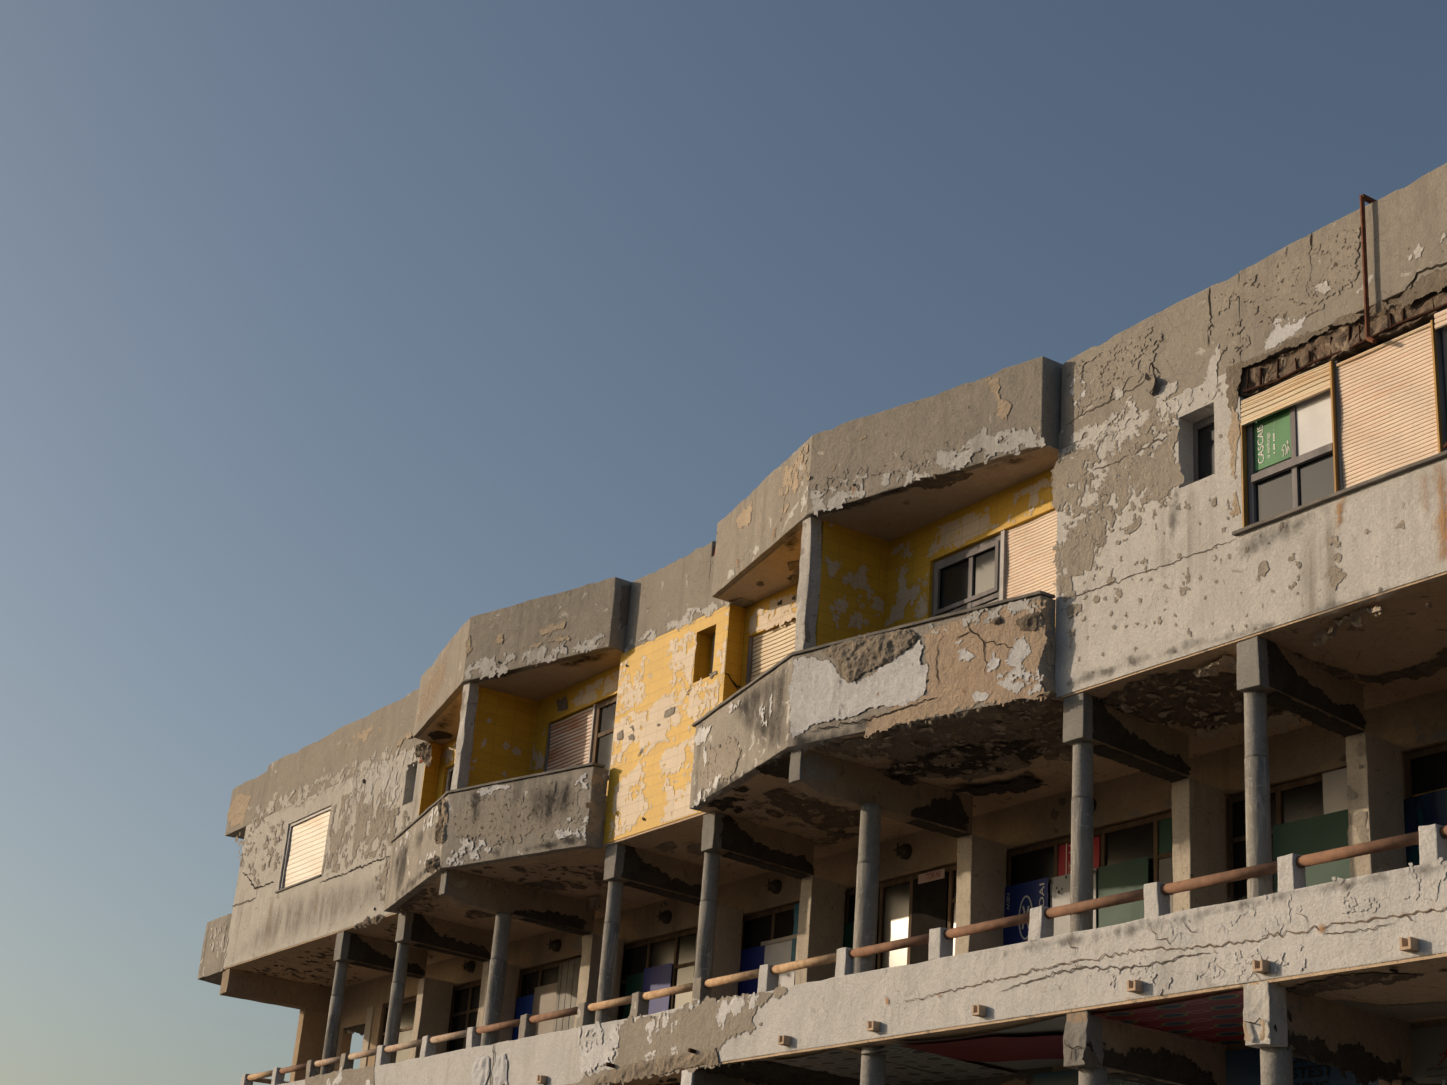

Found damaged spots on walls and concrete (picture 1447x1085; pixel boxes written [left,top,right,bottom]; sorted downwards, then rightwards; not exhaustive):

corrosion [1438,476,1447,557]
flaking render [227,221,1447,944]
crack [811,622,1014,732]
spalling [243,947,362,988]
flaking render [576,984,860,1085]
peeling [1095,962,1171,995]
crack [897,907,1447,1004]
peeling [1195,894,1447,1085]